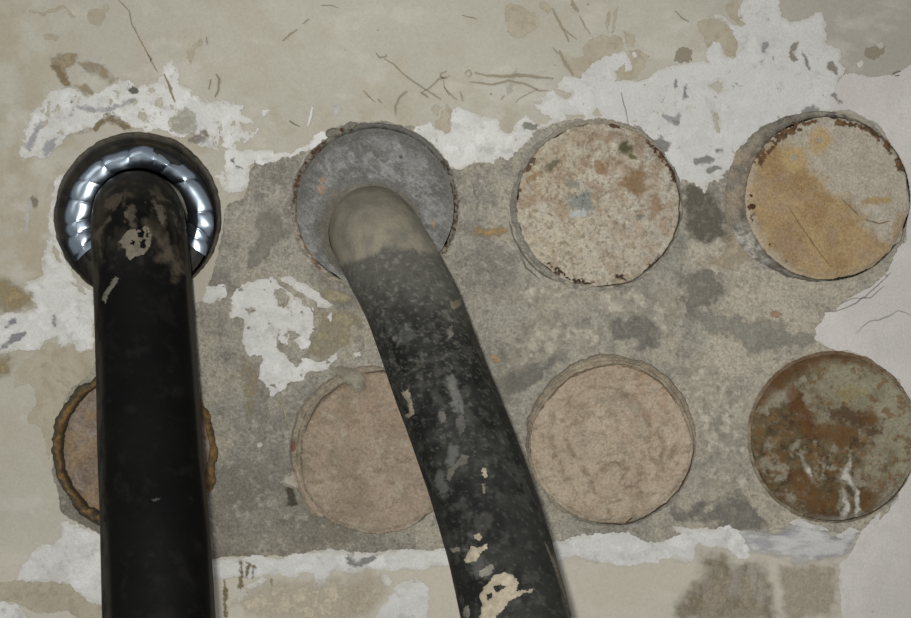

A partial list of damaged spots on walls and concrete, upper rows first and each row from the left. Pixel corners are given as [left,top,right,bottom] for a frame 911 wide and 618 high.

crack [121,2,175,102]
crack [376,0,589,114]
rust [753,119,817,168]
rust [834,118,904,171]
flaking render [19,60,449,618]
flaking render [355,0,911,618]
peeling [0,174,102,618]
leakage [678,558,772,618]
leakage [783,565,834,618]